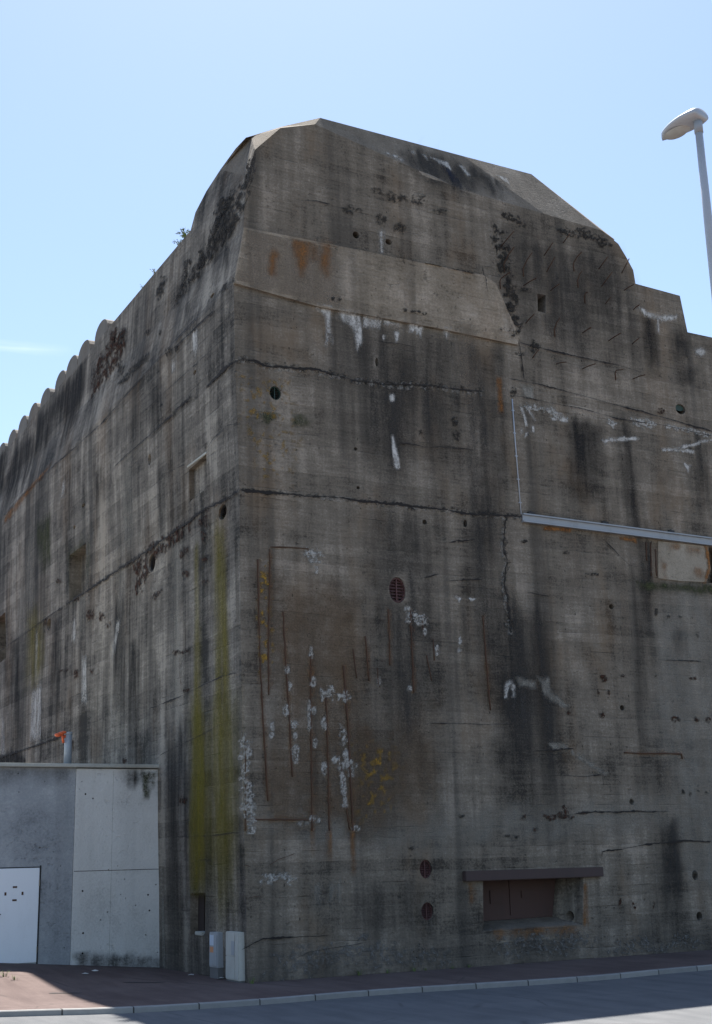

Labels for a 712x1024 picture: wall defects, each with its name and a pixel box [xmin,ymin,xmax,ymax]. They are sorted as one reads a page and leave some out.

water stain [409,151,507,194]
crack [0,281,482,520]
water stain [240,231,444,472]
water stain [663,434,711,477]
crack [0,488,547,651]
corrosion [257,546,309,801]
corrosion [325,636,370,854]
water stain [503,603,567,762]
crack [576,808,671,816]
crack [602,840,711,853]